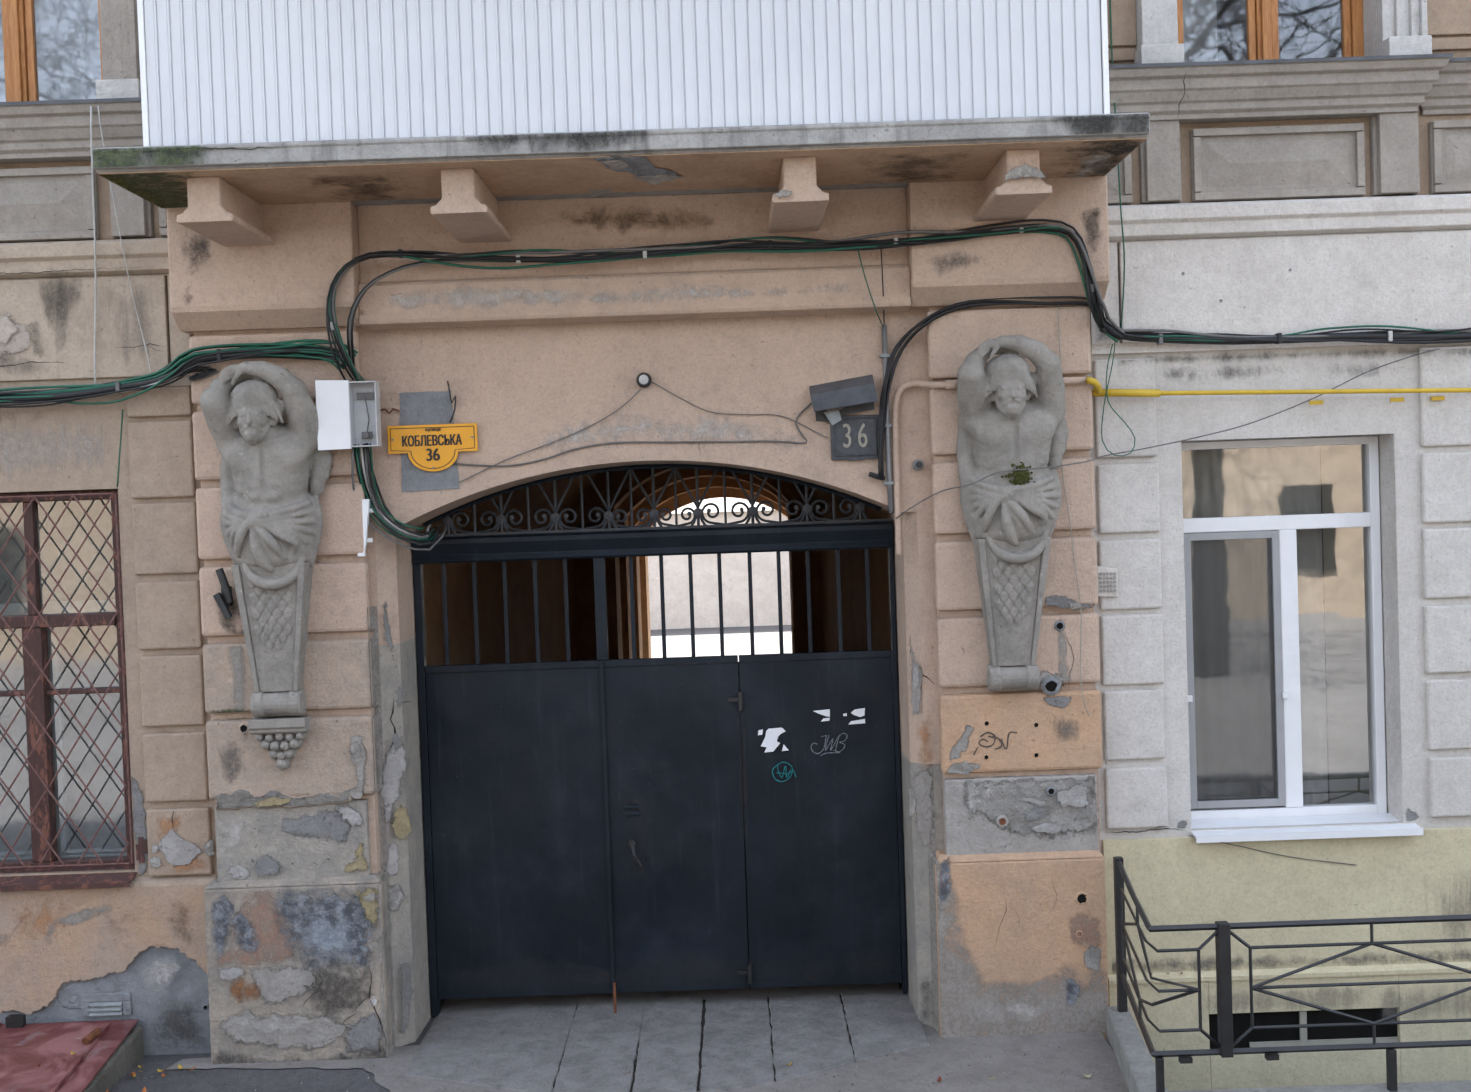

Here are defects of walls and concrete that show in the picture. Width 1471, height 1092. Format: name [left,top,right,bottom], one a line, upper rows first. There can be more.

peeling [0,312,31,356]
flaking render [136,829,215,868]
flaking render [215,733,412,927]
flaking render [908,754,1100,846]
damp [919,727,1296,1038]
flaking render [0,946,352,1055]
damp [1343,953,1471,964]